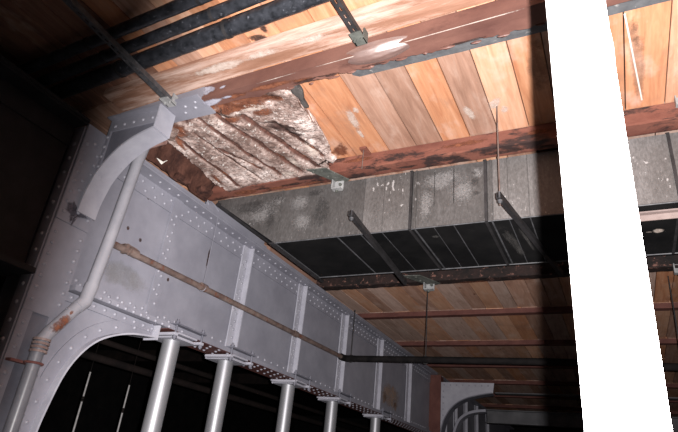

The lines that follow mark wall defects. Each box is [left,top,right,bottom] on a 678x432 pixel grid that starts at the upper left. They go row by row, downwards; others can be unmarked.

peeling [202,86,231,107]
peeling [290,84,309,108]
corrosion [53,311,73,332]